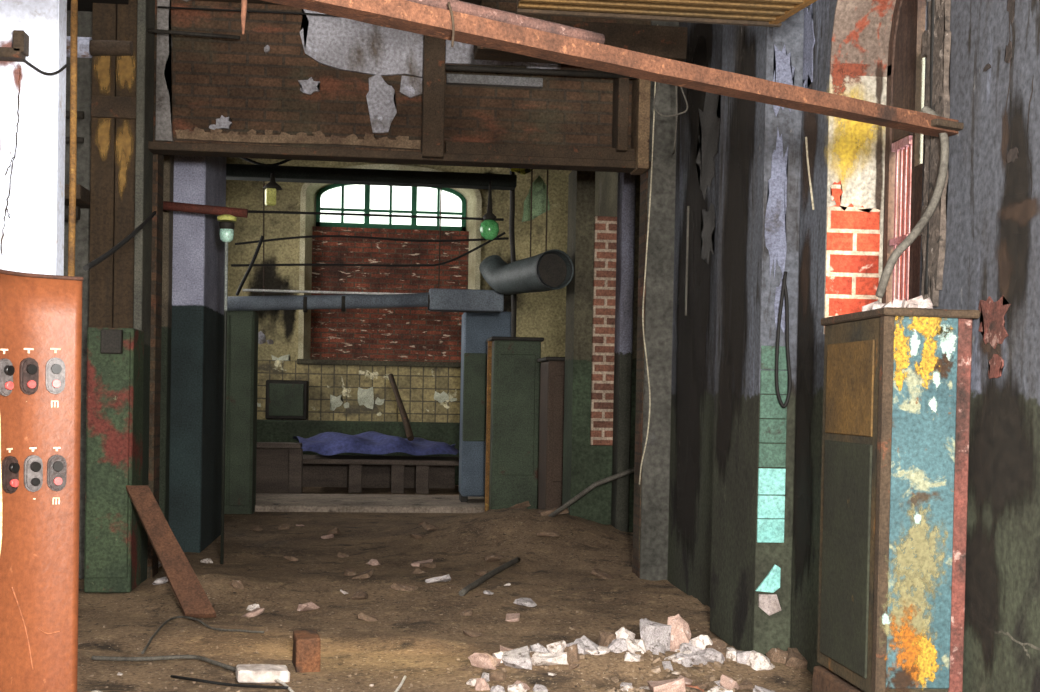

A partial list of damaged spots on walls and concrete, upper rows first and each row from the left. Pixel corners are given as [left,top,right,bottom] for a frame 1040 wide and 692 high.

corrosion [0,61,22,90]
corrosion [94,54,136,92]
flaking render [155,0,423,150]
leakage [686,23,713,67]
leakage [735,30,756,77]
corrosion [831,63,870,98]
leakage [803,111,817,204]
flaking render [824,181,880,334]
leakage [675,88,756,559]
peeling [330,387,384,411]
peeling [434,391,457,403]